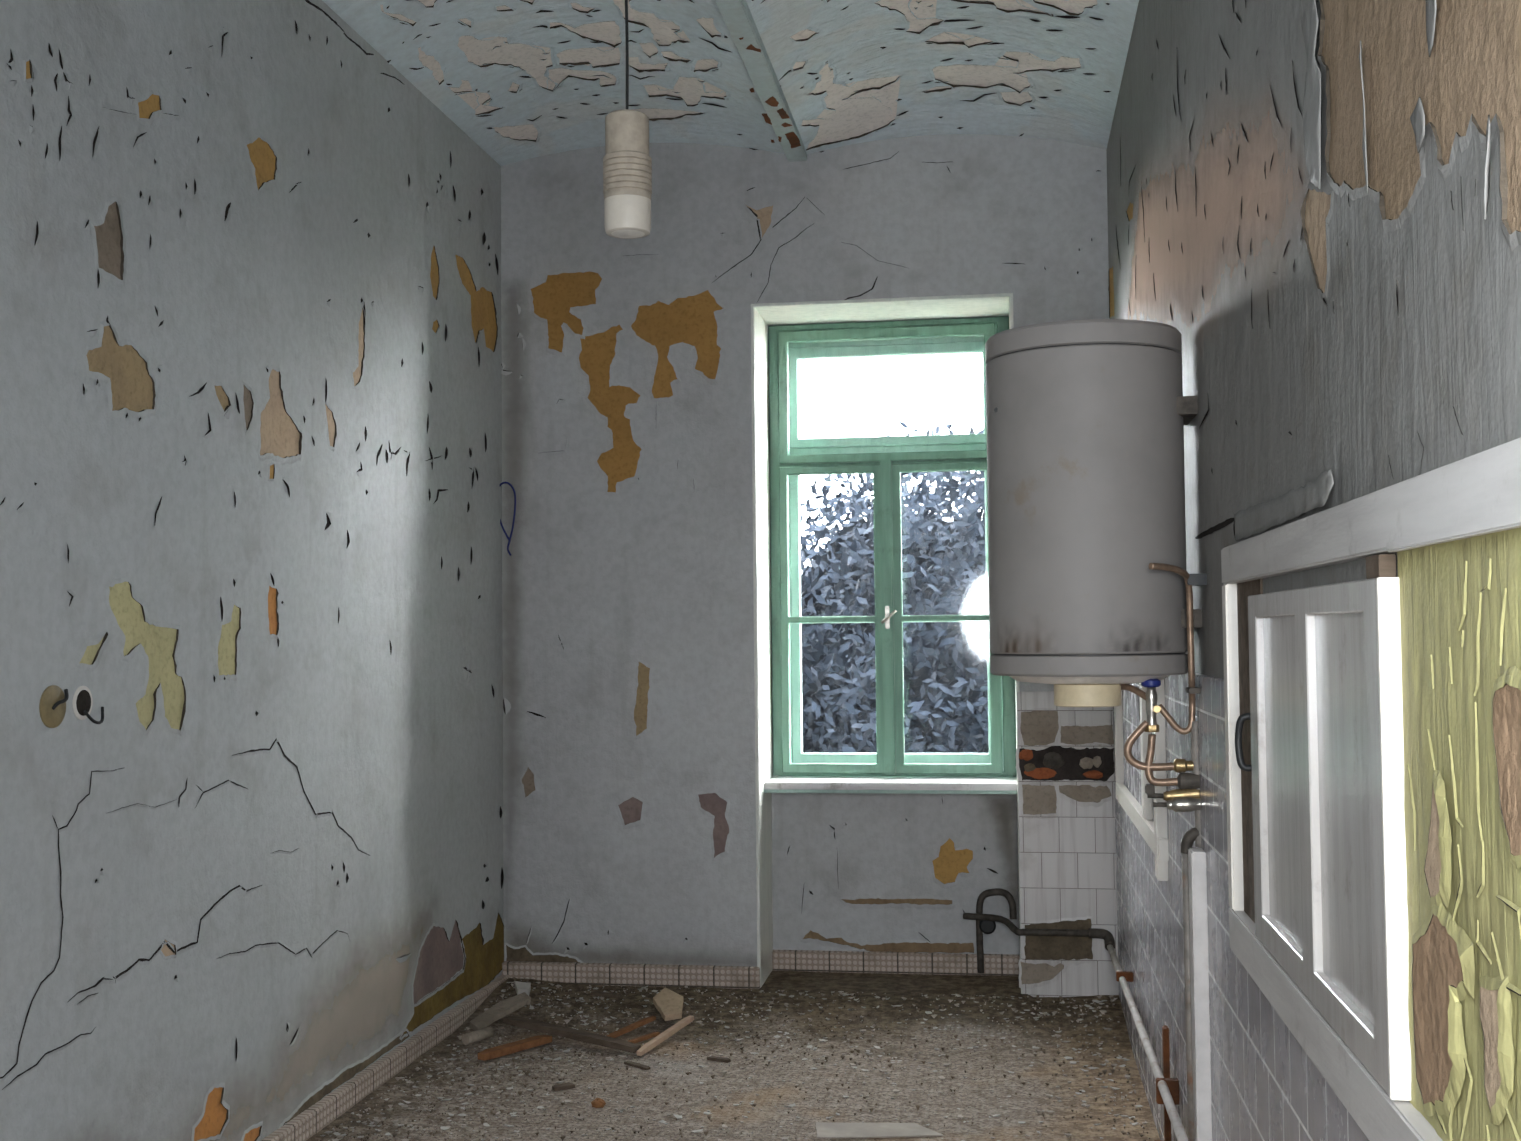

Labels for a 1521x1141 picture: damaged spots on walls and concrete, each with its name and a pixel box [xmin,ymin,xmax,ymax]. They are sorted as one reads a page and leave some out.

peeling [376,0,732,142]
peeling [870,0,1113,110]
crack [843,151,953,170]
peeling [1269,0,1521,314]
peeling [85,197,127,289]
crack [712,197,909,303]
peeling [82,316,162,422]
peeling [189,365,338,497]
peeling [517,269,727,498]
peeling [75,577,188,737]
crack [0,738,370,1090]
flaking render [191,864,588,1141]